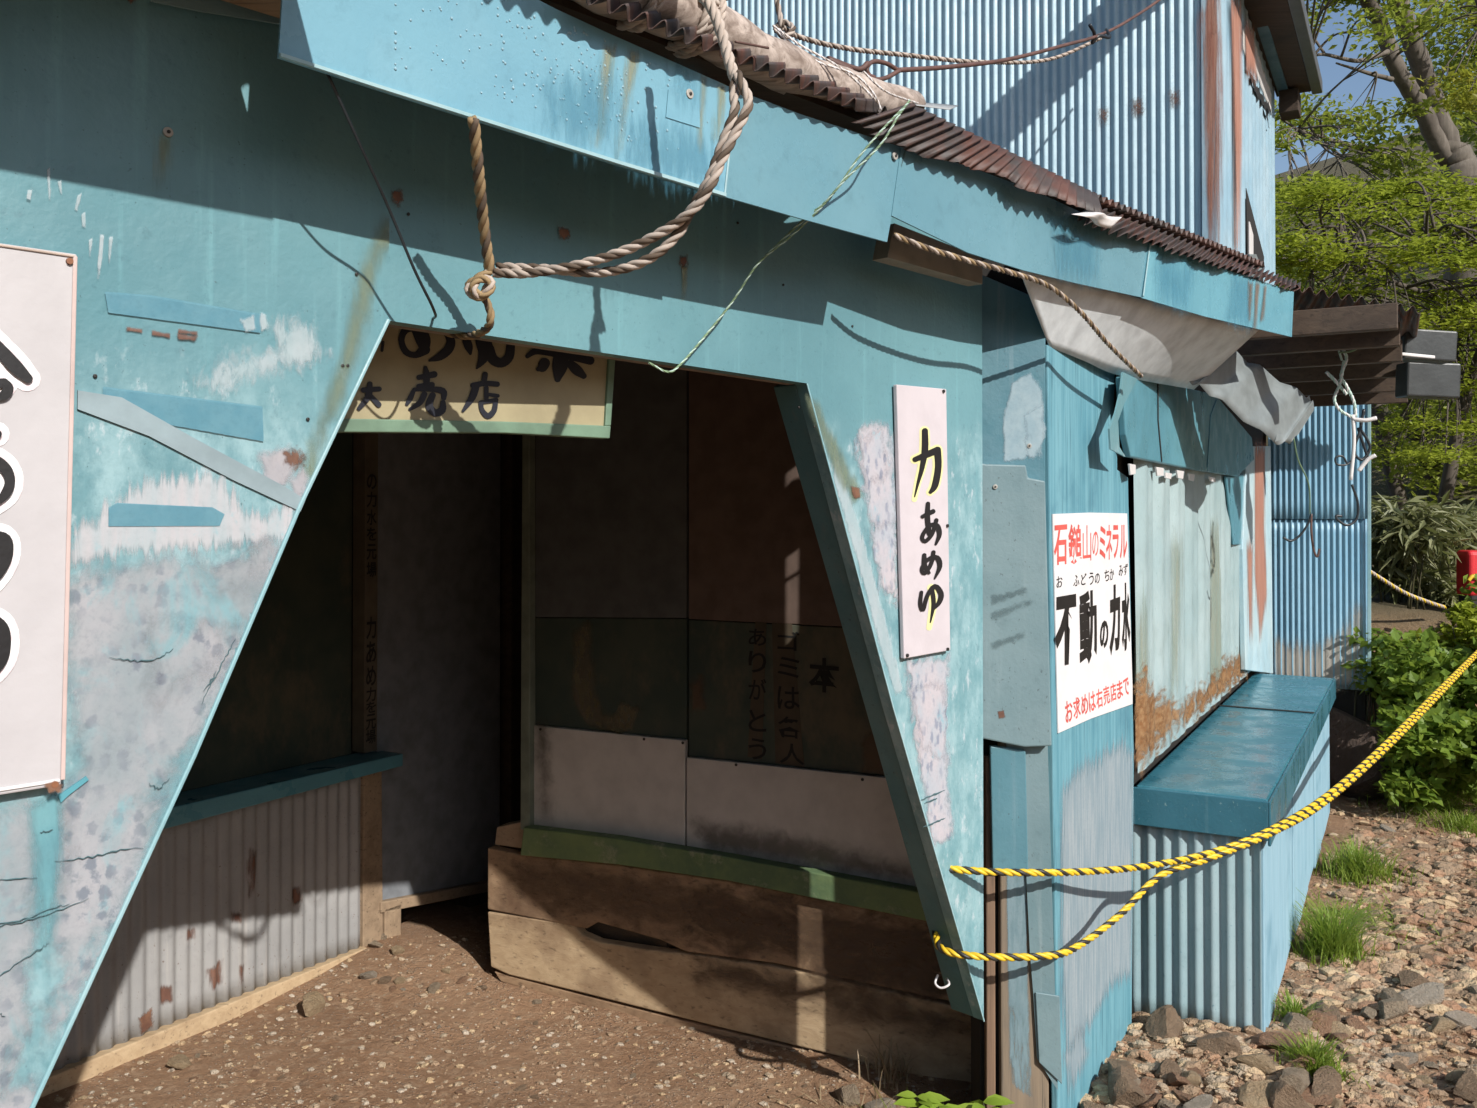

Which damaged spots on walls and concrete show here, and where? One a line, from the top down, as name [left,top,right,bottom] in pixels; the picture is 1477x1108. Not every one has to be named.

corrosion [1202,0,1256,248]
peeling [243,314,267,330]
peeling [1003,374,1046,461]
peeling [854,423,899,600]
crack [110,648,174,662]
peeling [49,450,307,1030]
corrosion [1134,655,1247,772]
crack [40,829,143,862]
peeling [0,802,37,1108]
crack [0,900,85,976]
corrosion [139,986,172,1033]
corrosion [209,961,221,989]